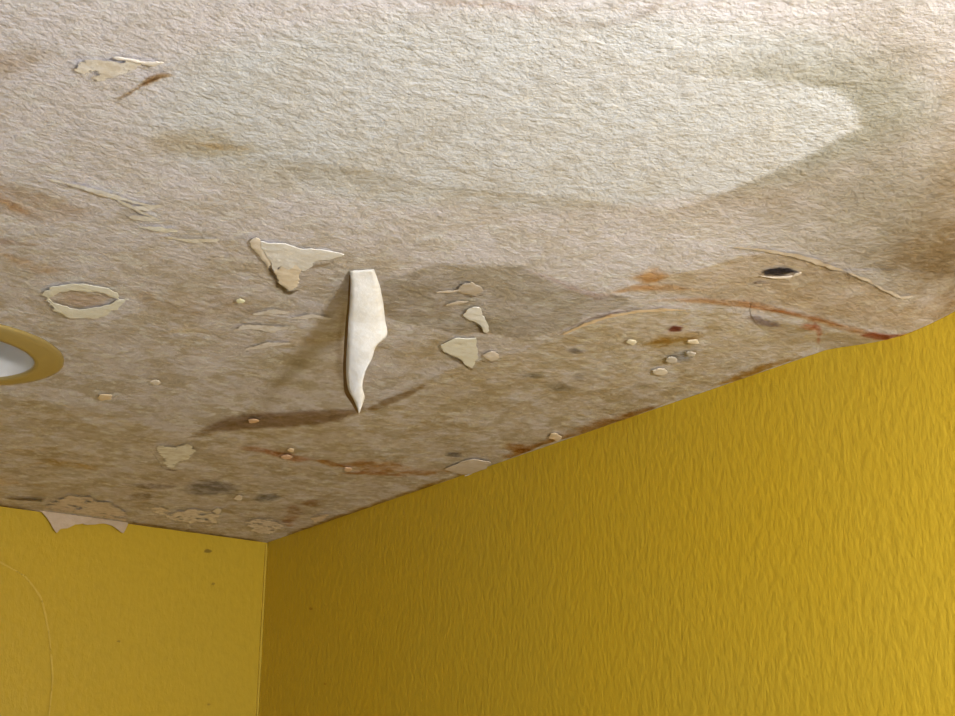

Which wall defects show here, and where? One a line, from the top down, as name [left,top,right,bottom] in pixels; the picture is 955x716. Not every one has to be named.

peeling [75,57,164,81]
peeling [249,237,344,294]
peeling [343,269,387,413]
peeling [436,282,499,368]
peeling [156,442,196,468]
peeling [16,495,130,533]